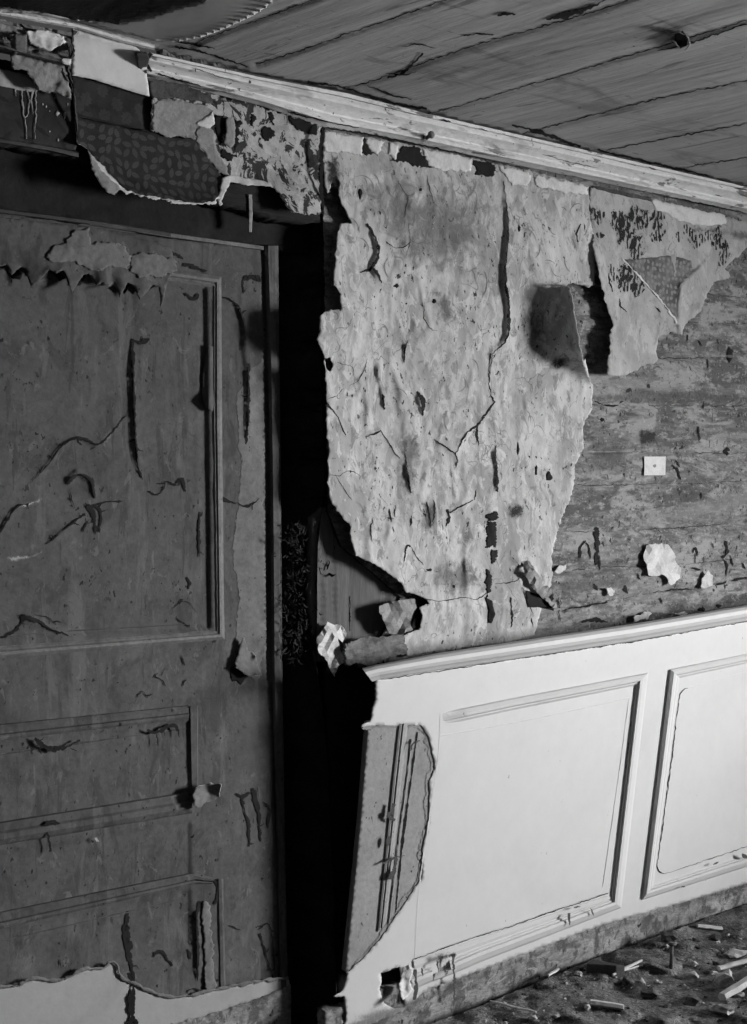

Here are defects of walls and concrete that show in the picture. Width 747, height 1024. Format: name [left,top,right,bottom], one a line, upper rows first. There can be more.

peeling [10,54,72,99]
peeling [323,131,727,226]
crack [434,353,496,467]
peeling [643,543,681,586]
peeling [701,570,713,588]
spalling [411,599,428,629]
peeling [235,638,262,677]
peeling [192,783,222,809]
peeling [398,965,413,1001]